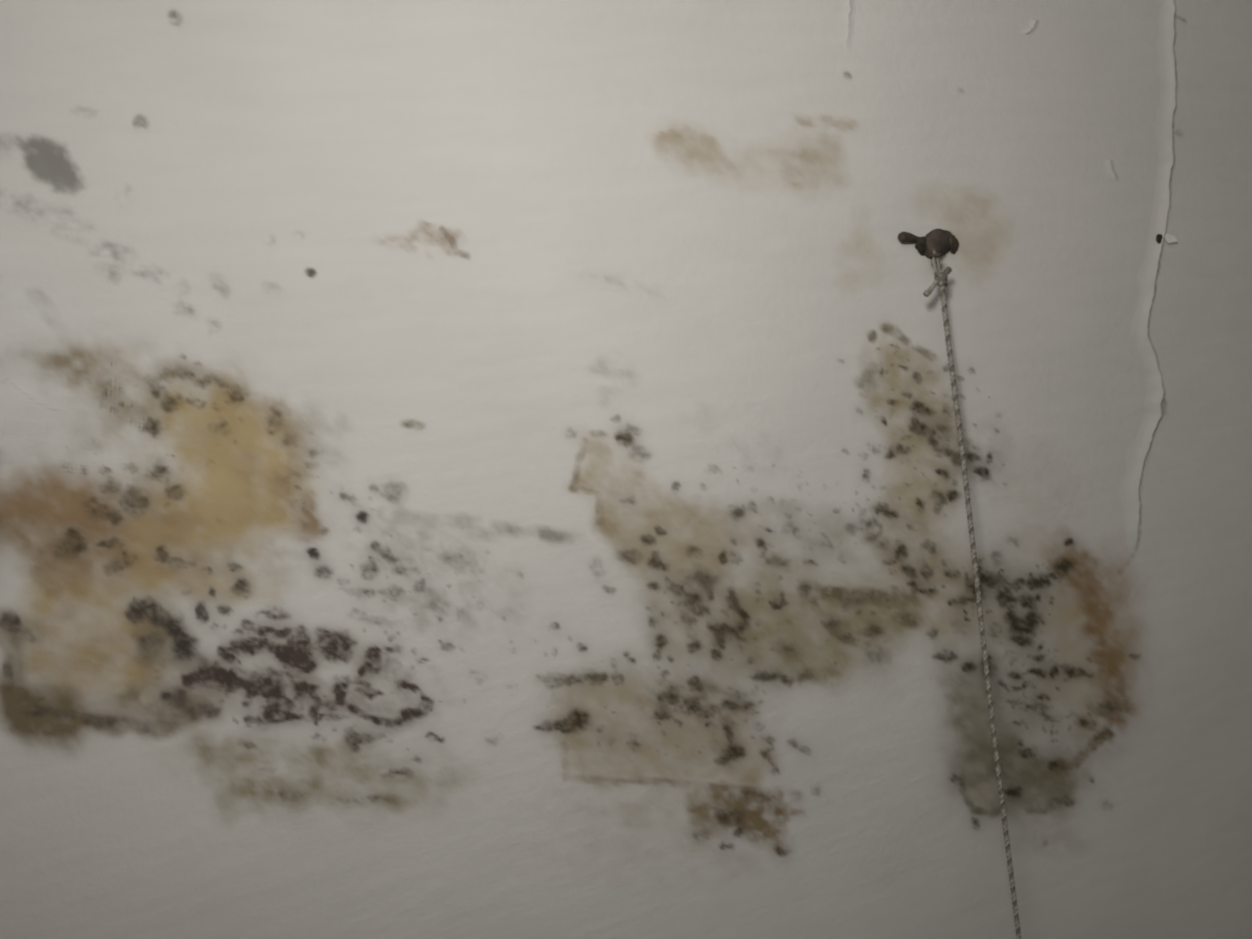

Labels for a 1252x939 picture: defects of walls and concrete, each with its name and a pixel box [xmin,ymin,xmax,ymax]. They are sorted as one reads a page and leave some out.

leakage [302,265,320,281]
crack [1116,0,1188,577]
leakage [0,311,1173,901]